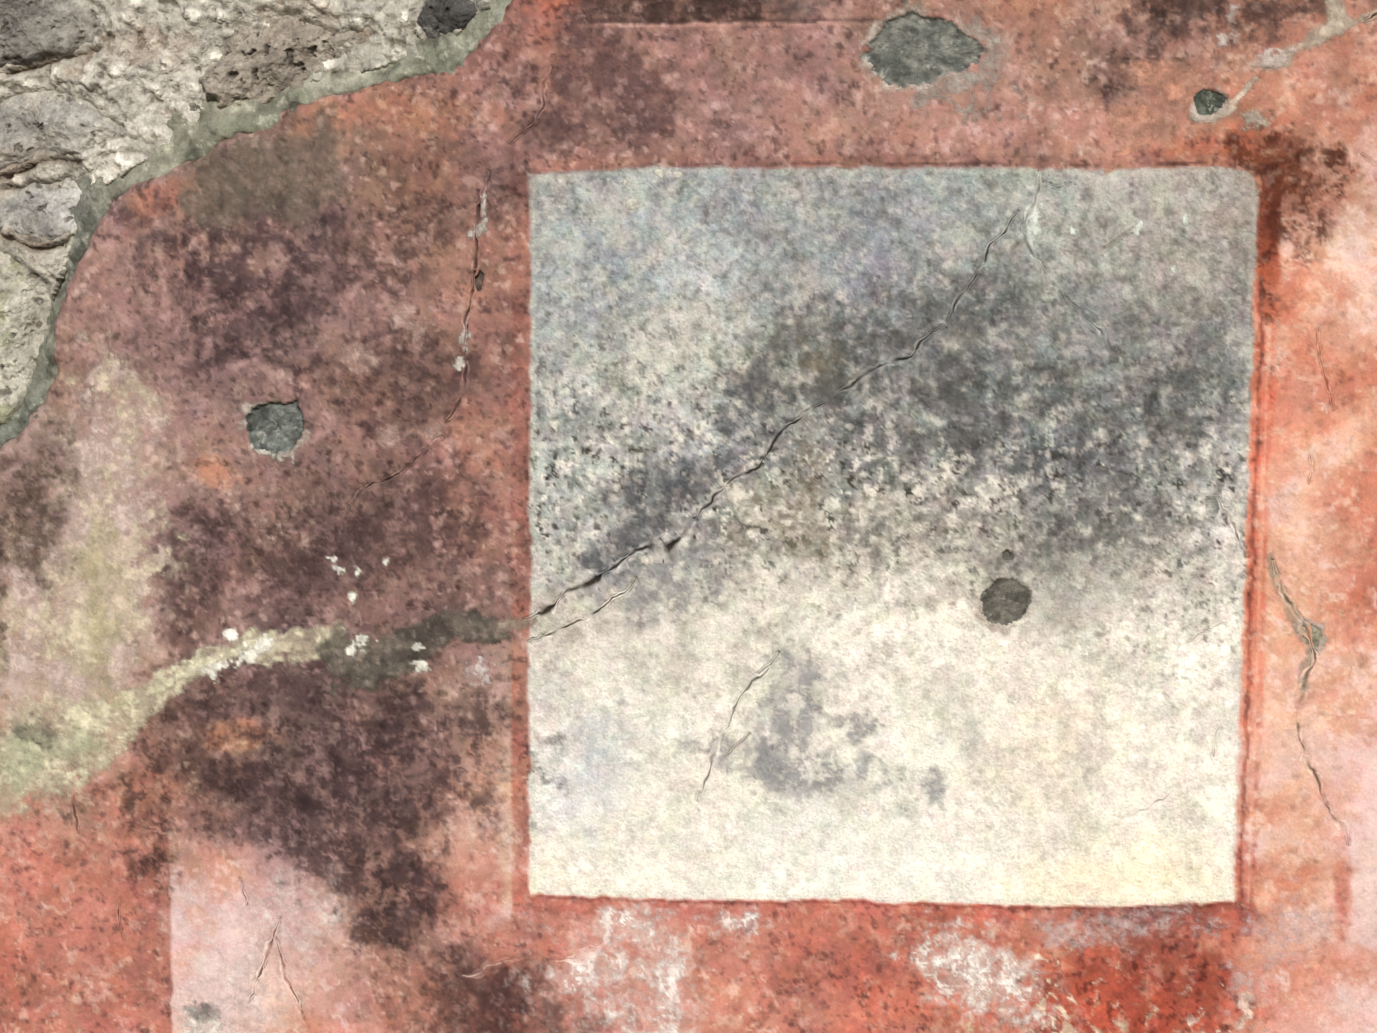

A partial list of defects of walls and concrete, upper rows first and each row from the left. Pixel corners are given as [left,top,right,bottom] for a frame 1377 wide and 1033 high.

flaking render [859,5,1000,117]
crack [1190,0,1377,122]
spalling [0,0,512,449]
crack [341,66,553,530]
crack [1101,228,1135,253]
crack [0,170,1116,834]
leakage [123,772,167,827]
leakage [133,847,167,876]
leakage [199,660,507,955]
crack [1217,497,1351,846]